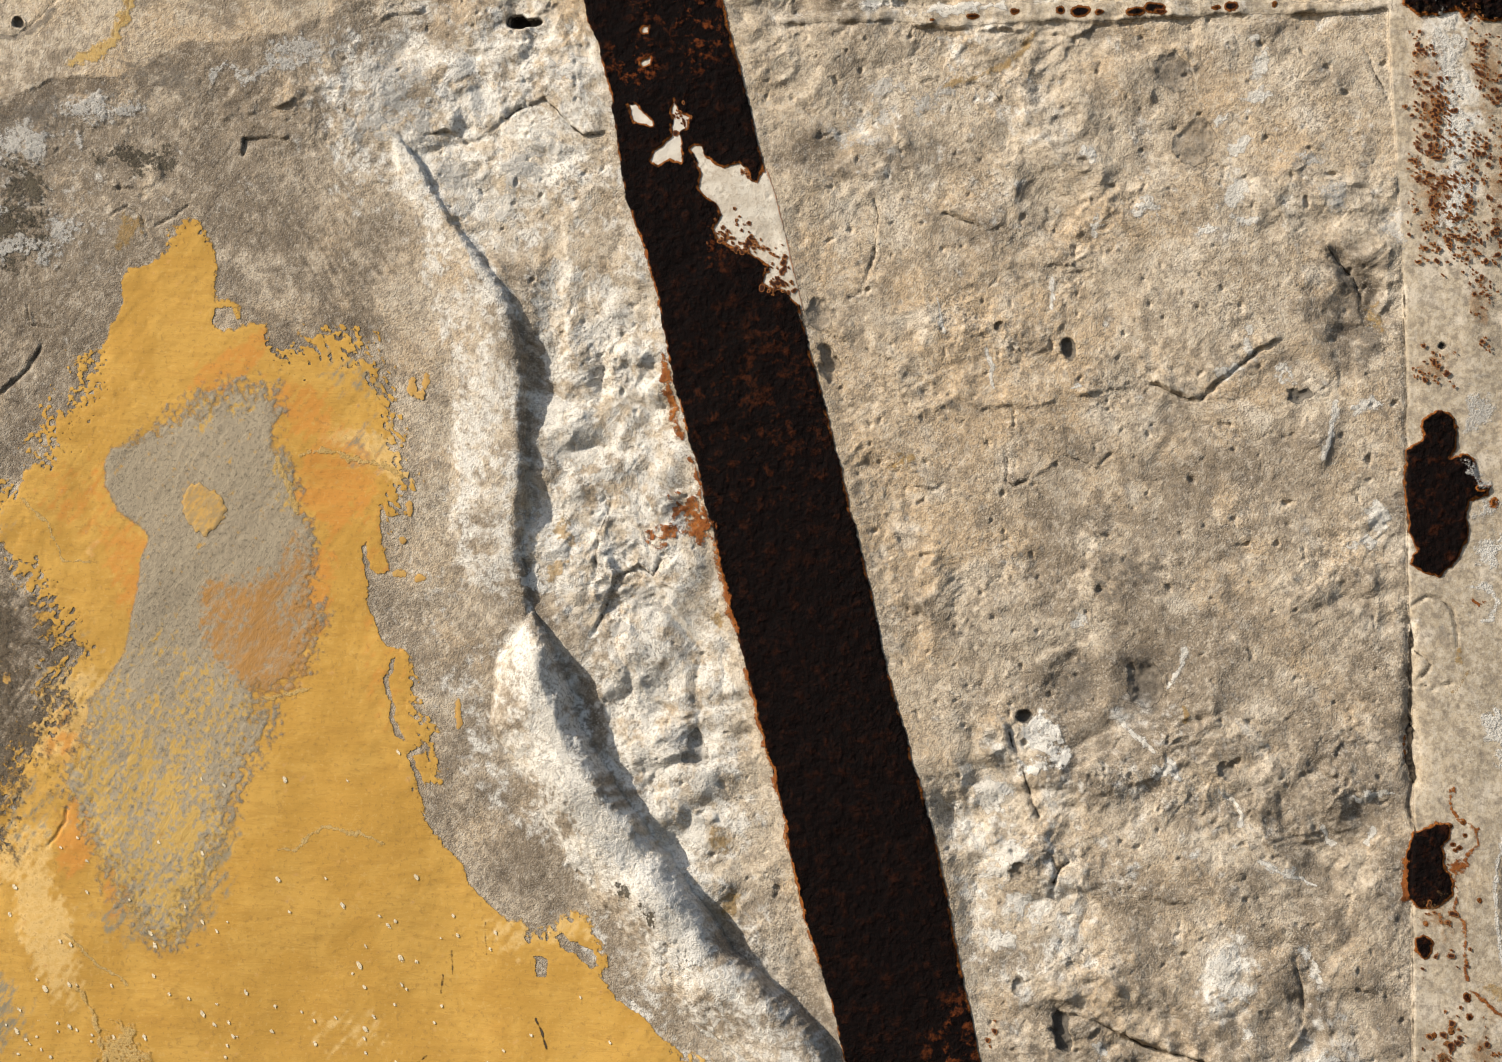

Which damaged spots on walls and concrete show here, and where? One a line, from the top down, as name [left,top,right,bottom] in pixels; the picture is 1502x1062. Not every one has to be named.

rust [1056,5,1104,18]
rust [1125,1,1167,16]
rust [1211,1,1238,12]
rust [1402,0,1502,316]
rust [1412,343,1456,389]
peeling [0,218,706,1062]
rust [584,0,997,1062]
crack [1403,295,1454,833]
rust [1402,410,1499,578]
rust [1400,787,1502,1062]
crack [1096,1021,1204,1062]